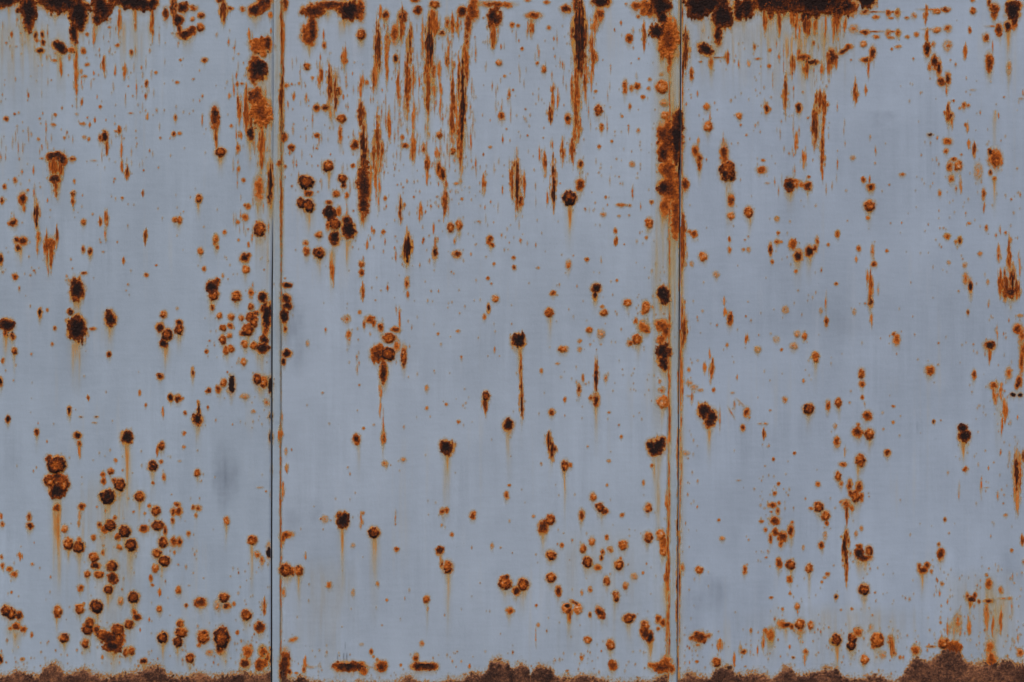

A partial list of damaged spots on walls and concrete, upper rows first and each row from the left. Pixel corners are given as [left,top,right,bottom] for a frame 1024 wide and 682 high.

corrosion [0,0,205,182]
corrosion [155,0,613,445]
corrosion [941,213,1021,306]
corrosion [156,440,166,481]
corrosion [578,492,624,522]
corrosion [802,368,895,610]
corrosion [40,633,69,652]
corrosion [53,605,67,623]
corrosion [498,574,530,615]
corrosion [532,514,647,623]